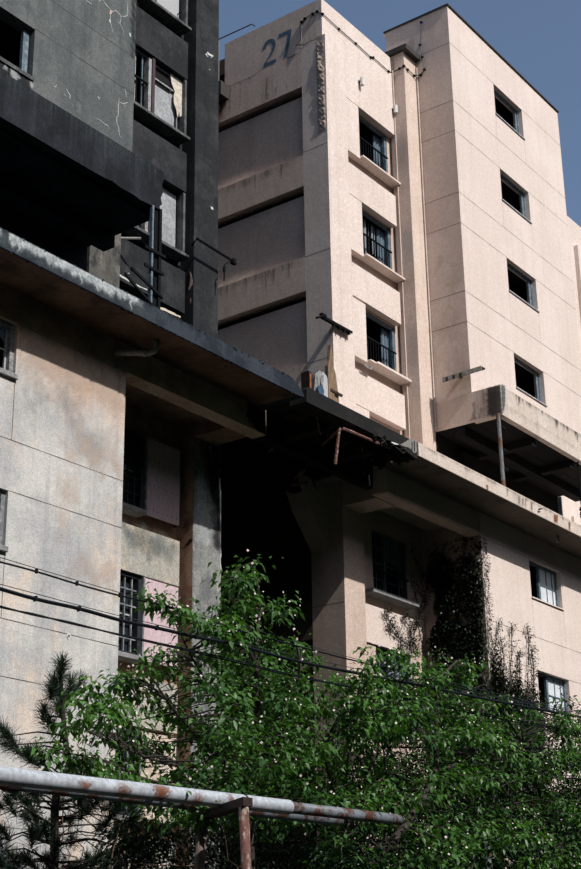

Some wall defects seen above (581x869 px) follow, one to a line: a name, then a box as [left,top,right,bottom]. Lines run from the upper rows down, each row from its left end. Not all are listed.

damp [0,229,139,306]